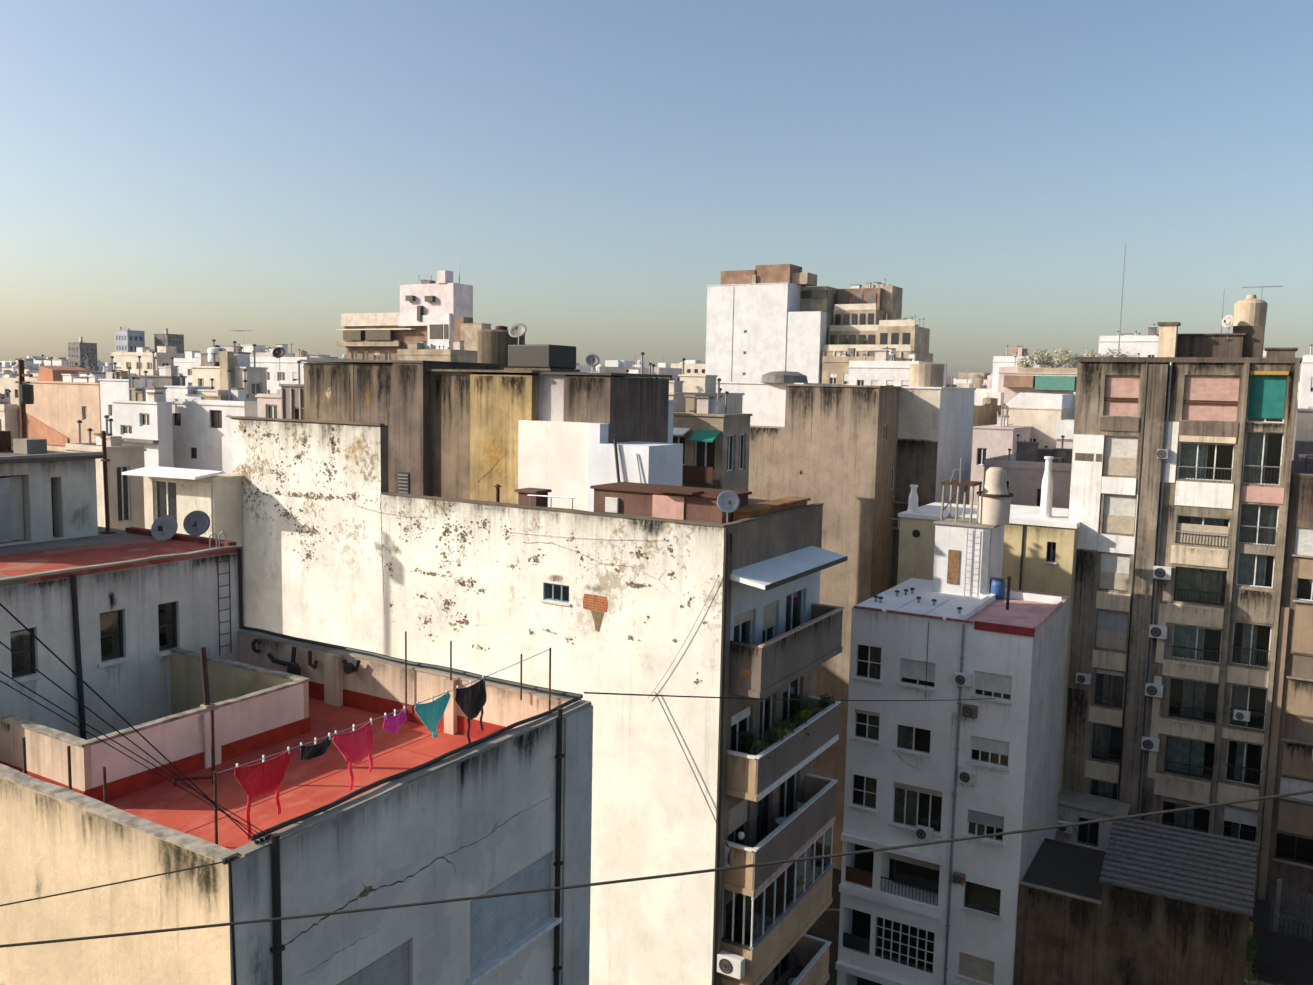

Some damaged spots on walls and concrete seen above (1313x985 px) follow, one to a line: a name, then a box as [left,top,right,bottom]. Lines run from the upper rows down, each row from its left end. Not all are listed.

water stain [309,364,415,397]
water stain [435,375,523,402]
peeling [234,425,372,569]
peeling [398,496,515,651]
peeling [611,543,676,589]
spalling [583,594,608,632]
crack [284,796,552,945]
water stain [1112,886,1239,953]